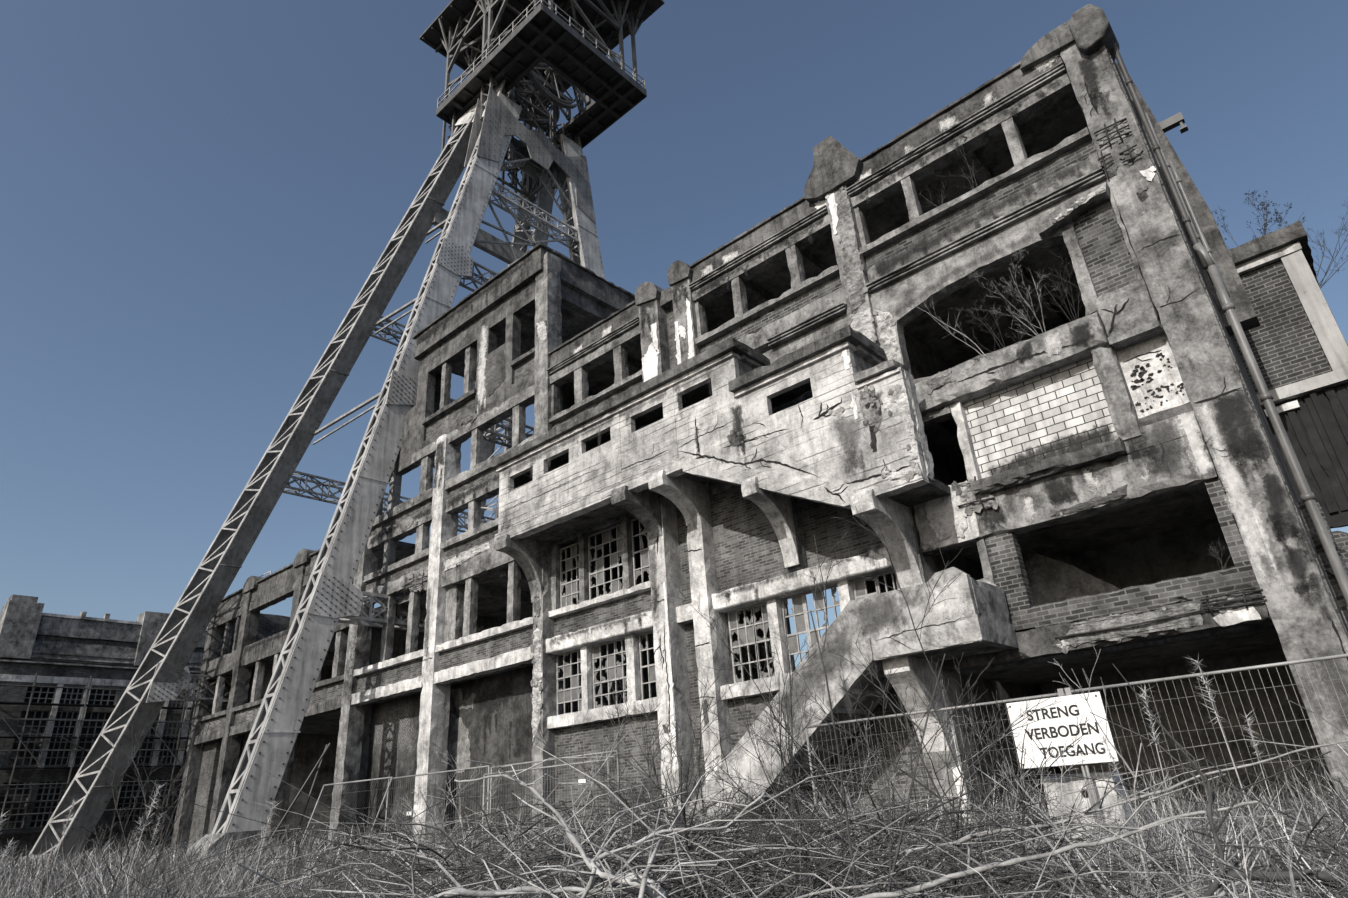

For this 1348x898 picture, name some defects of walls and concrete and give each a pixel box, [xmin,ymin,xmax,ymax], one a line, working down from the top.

peeling [642,323,660,382]
peeling [674,298,695,364]
peeling [1130,352,1184,412]
crack [507,398,911,529]
peeling [924,476,999,542]
water stain [989,391,1330,617]